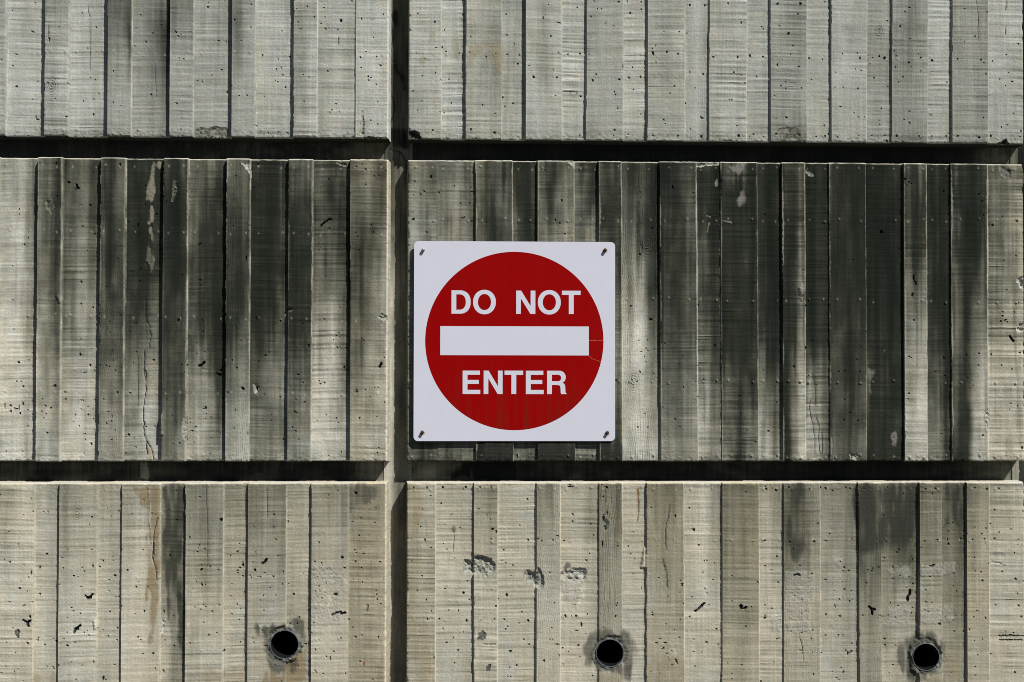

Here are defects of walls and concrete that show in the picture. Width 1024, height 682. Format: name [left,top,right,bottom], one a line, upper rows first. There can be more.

water stain [147,162,161,234]
crack [138,298,154,460]
water stain [792,483,802,504]
water stain [854,484,916,551]
water stain [163,487,184,644]
spalling [462,555,496,578]
spalling [523,568,544,590]
spalling [560,567,587,585]
water stain [257,620,304,672]